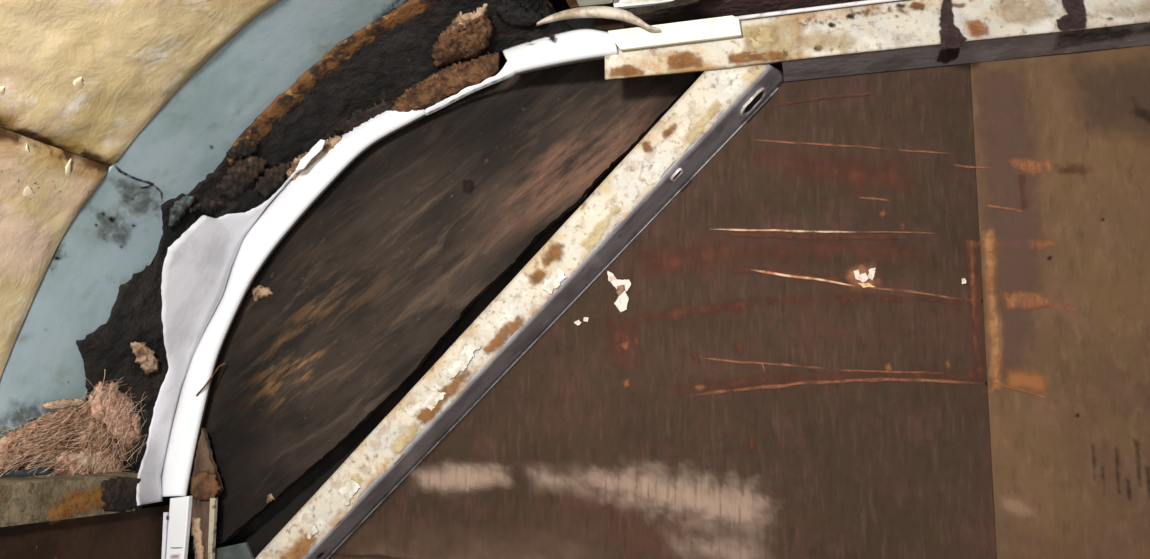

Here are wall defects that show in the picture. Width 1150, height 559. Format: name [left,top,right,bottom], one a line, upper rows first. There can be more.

corrosion [668,51,701,69]
corrosion [529,243,563,284]
peeling [540,268,567,294]
peeling [607,271,631,312]
peeling [848,265,875,288]
corrosion [922,231,1054,392]
corrosion [484,317,523,353]
corrosion [392,370,469,452]
peeling [425,389,446,411]
leakage [417,464,508,490]
leakage [535,469,768,529]
leakage [699,542,755,559]